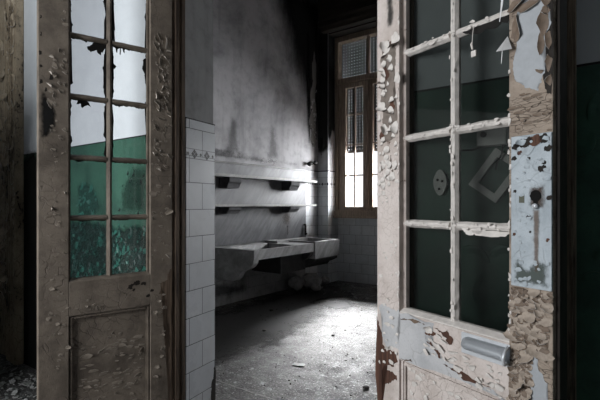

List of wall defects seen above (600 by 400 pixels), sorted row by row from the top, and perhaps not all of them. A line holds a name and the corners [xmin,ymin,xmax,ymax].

peeling [39,48,67,108]
peeling [151,32,174,171]
damp [312,23,335,155]
peeling [375,0,555,400]